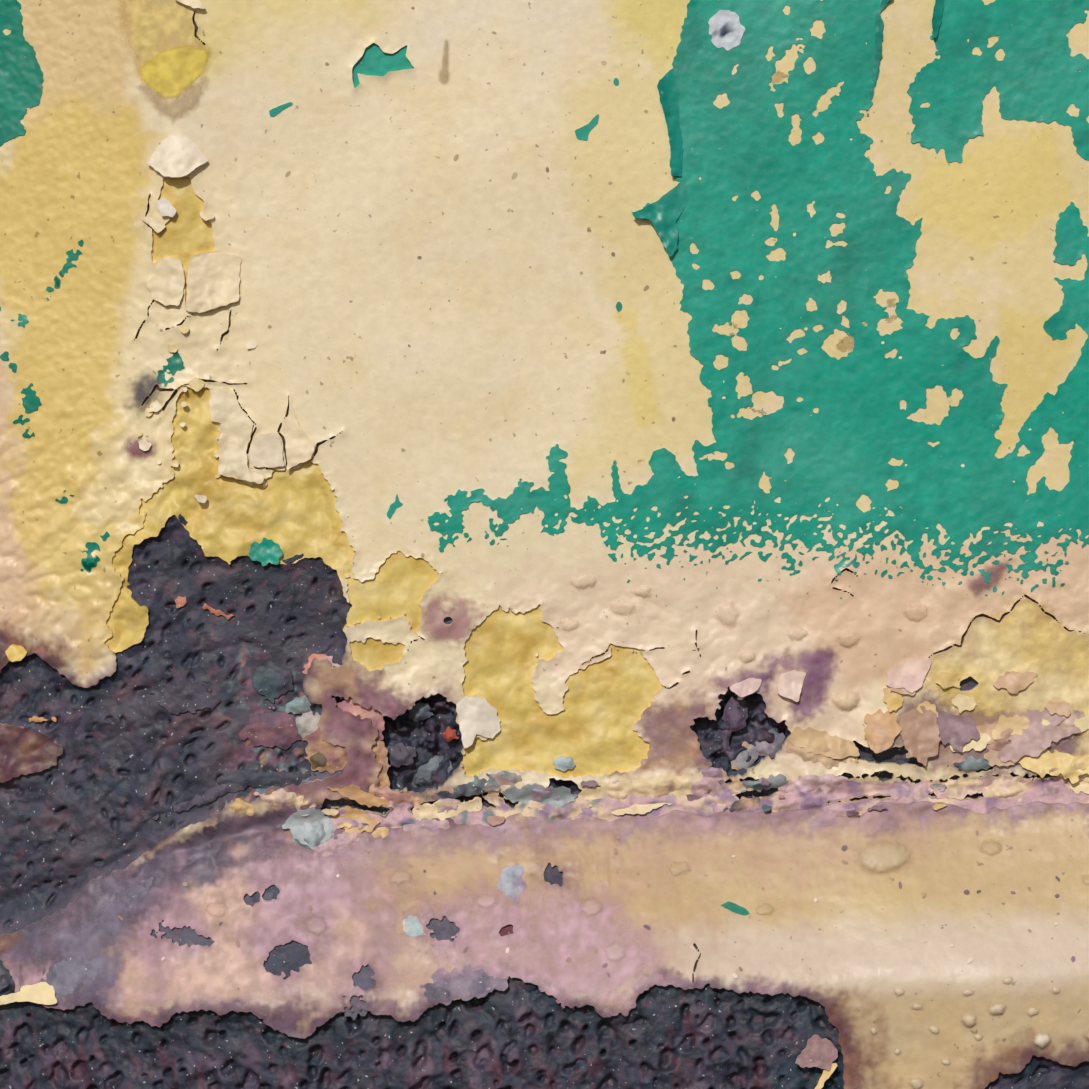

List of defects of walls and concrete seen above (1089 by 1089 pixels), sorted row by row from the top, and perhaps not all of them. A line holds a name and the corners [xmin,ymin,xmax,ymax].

spalling [765,20,844,146]
peeling [856,0,1089,495]
crack [134,299,186,340]
crack [217,311,231,351]
crack [141,378,289,469]
crack [314,431,343,456]
spalling [731,372,803,420]
crack [928,594,1081,658]
peeling [926,598,1089,717]
peeling [456,604,665,787]
peeling [0,982,57,1005]
peeling [795,1034,838,1089]